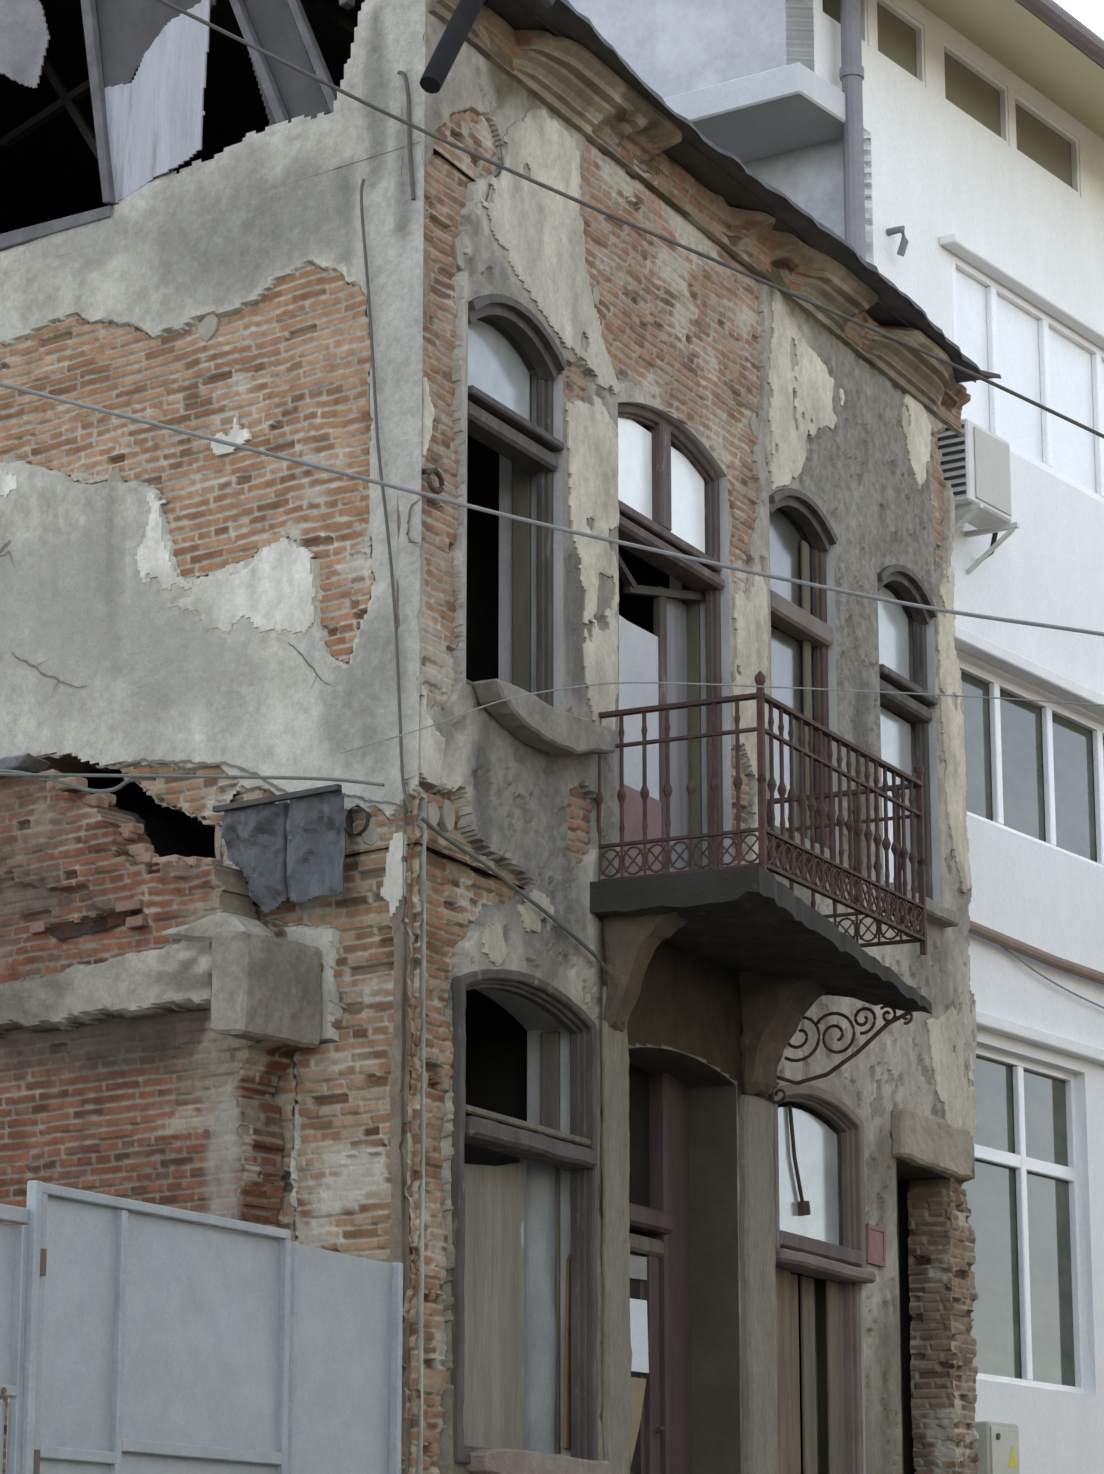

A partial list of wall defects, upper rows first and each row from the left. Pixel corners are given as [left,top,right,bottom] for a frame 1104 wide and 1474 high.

crack [0,540,15,567]
flaking render [0,264,374,662]
spalling [30,899,148,942]
spalling [35,753,284,884]
flaking render [253,107,845,1474]
flaking render [943,1177,979,1474]